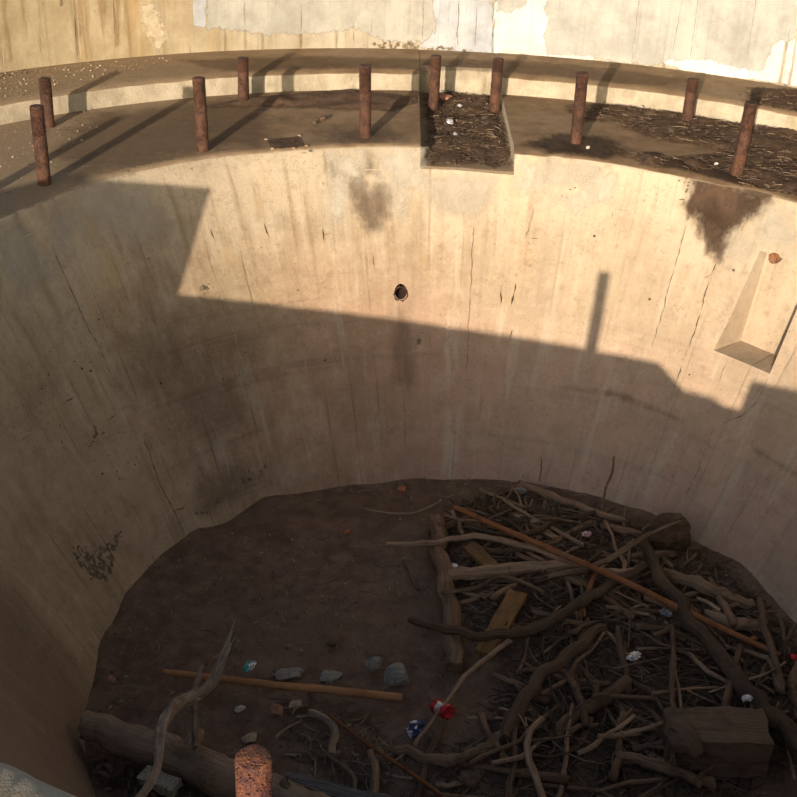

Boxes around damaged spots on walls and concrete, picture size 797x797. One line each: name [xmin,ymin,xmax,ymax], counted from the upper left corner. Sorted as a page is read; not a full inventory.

peeling [193,0,797,86]
damp [328,129,421,229]
damp [663,157,772,257]
crack [652,227,686,344]
crack [673,257,720,390]